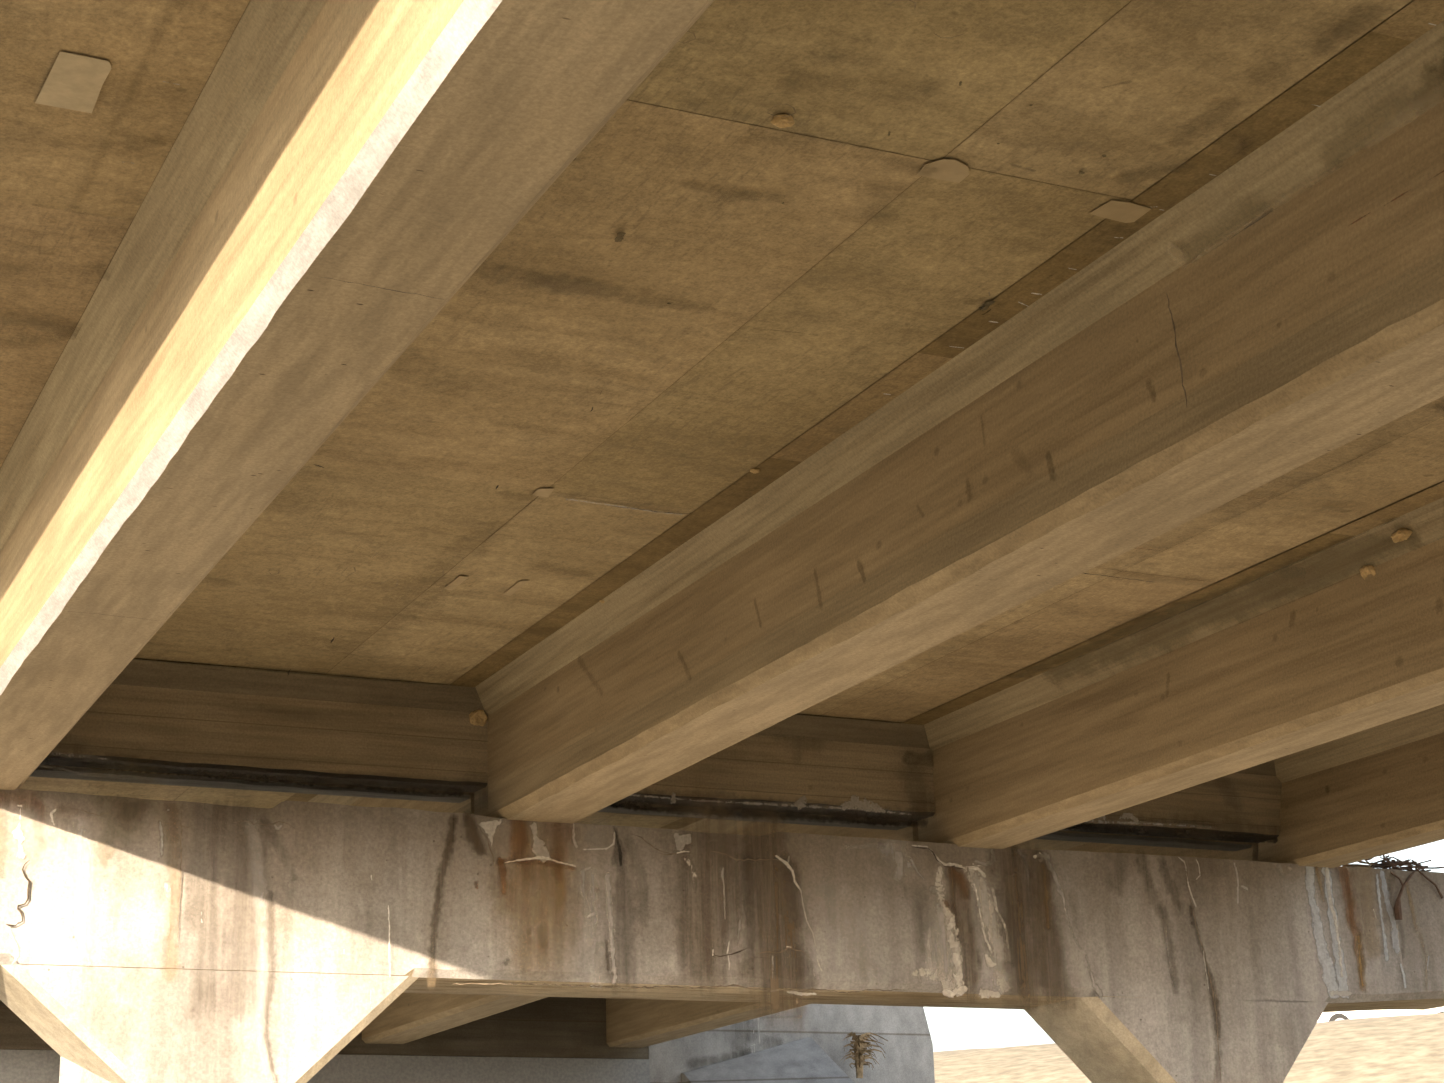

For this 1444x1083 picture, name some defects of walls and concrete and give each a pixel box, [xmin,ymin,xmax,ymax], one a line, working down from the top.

leakage [41,760,464,796]
crack [6,860,31,964]
leakage [428,816,455,985]
efflorescence [1305,866,1352,999]